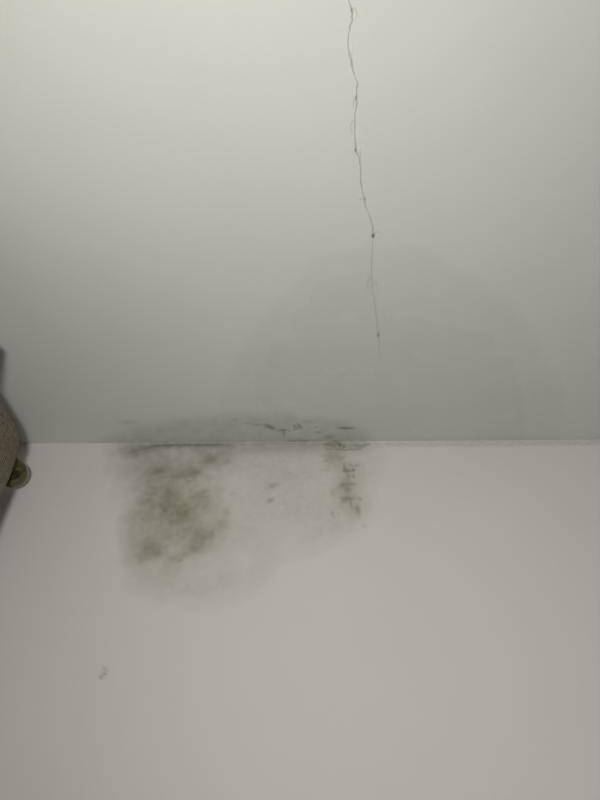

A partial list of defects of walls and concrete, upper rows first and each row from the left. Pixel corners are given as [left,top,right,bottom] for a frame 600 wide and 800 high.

crack [347,0,380,352]